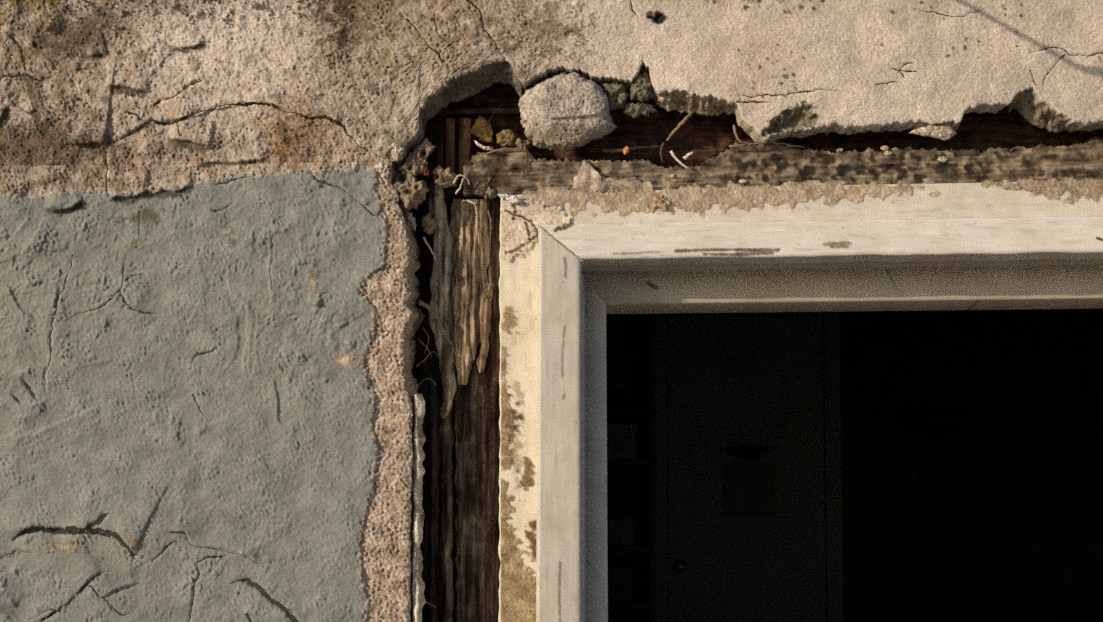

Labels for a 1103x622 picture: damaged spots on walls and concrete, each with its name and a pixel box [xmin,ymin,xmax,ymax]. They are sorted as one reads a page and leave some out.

crack [0,33,52,81]
flaking render [0,0,1103,168]
crack [736,89,828,103]
crack [876,62,917,85]
crack [1029,47,1103,85]
crack [104,79,388,200]
crack [307,172,379,218]
peeling [981,177,1103,204]
peeling [501,306,518,334]
spalling [334,169,413,622]
peeling [501,346,536,622]
crack [0,513,299,622]